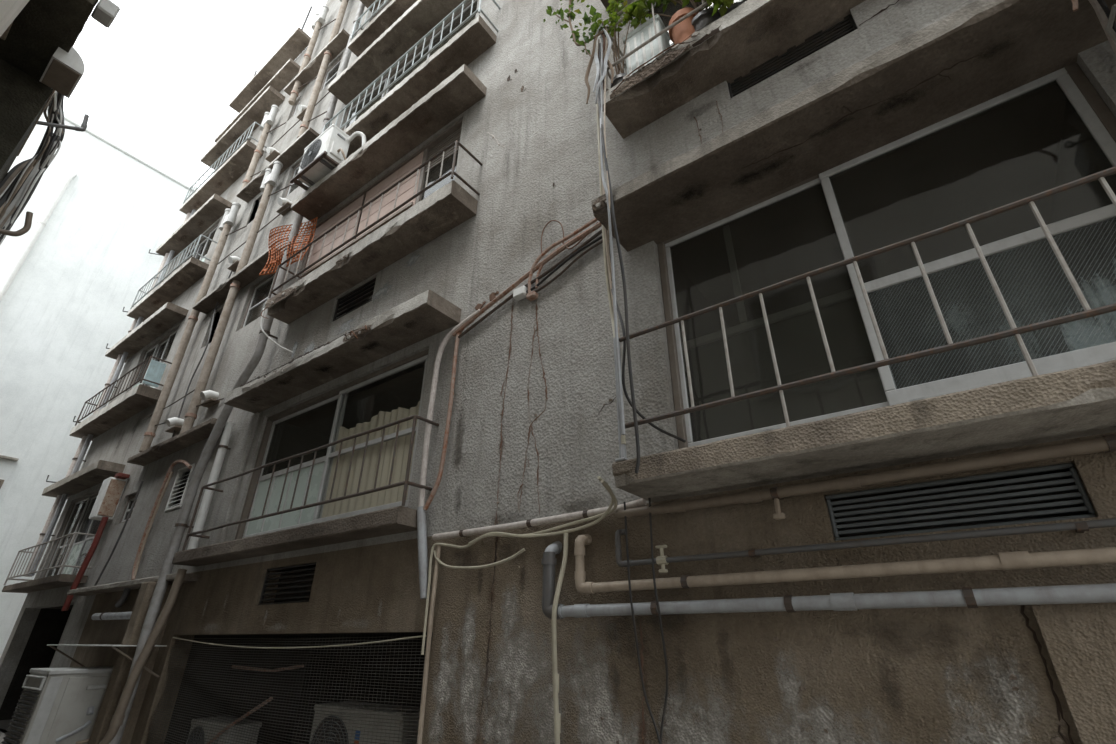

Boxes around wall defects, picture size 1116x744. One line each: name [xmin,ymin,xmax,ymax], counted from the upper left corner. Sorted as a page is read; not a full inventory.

crack [478,301,548,731]
crack [1020,605,1074,744]